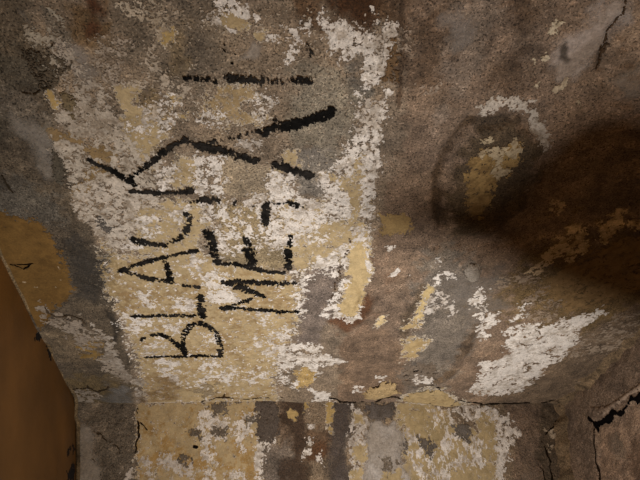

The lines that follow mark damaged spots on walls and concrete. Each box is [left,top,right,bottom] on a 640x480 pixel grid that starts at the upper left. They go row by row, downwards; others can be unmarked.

crack [595,0,626,69]
peeling [463,136,524,220]
peeling [0,0,415,480]
water stain [447,278,508,313]
peeling [346,208,640,480]
crack [587,392,640,480]